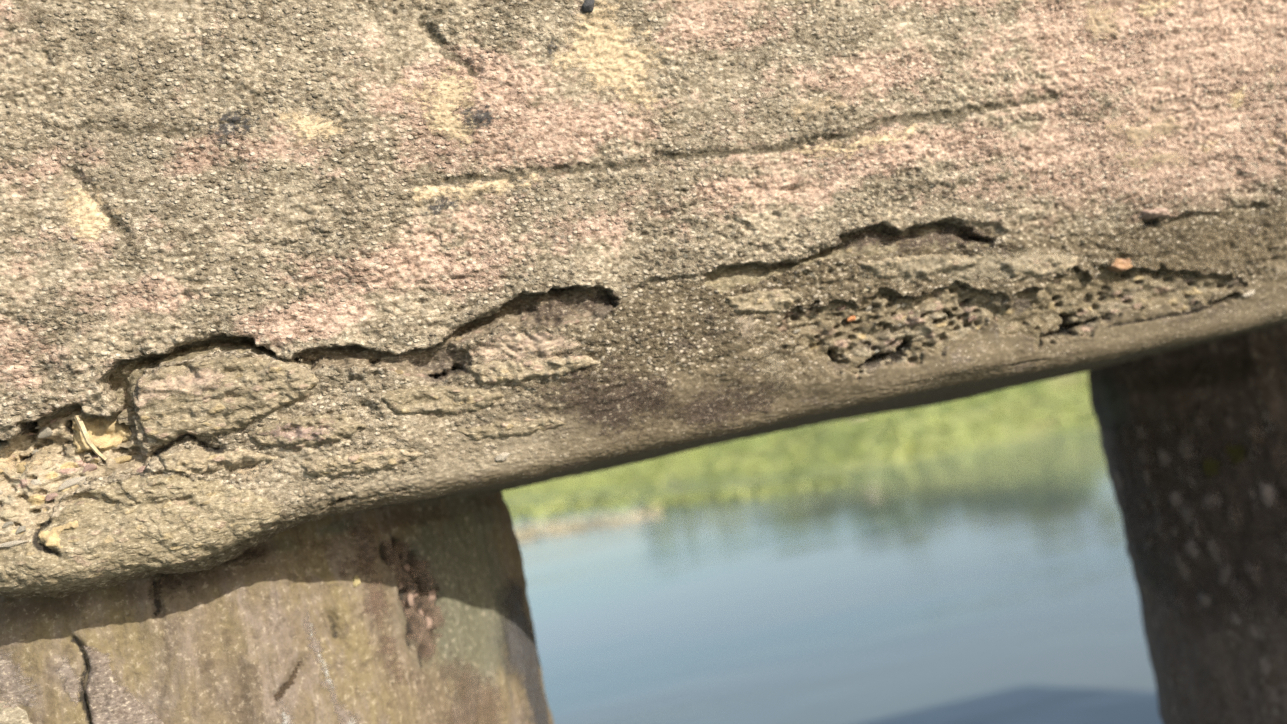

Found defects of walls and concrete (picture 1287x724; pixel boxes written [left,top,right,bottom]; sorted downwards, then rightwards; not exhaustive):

spalling [705,222,1245,392]
spalling [0,287,614,549]
crack [71,637,92,724]